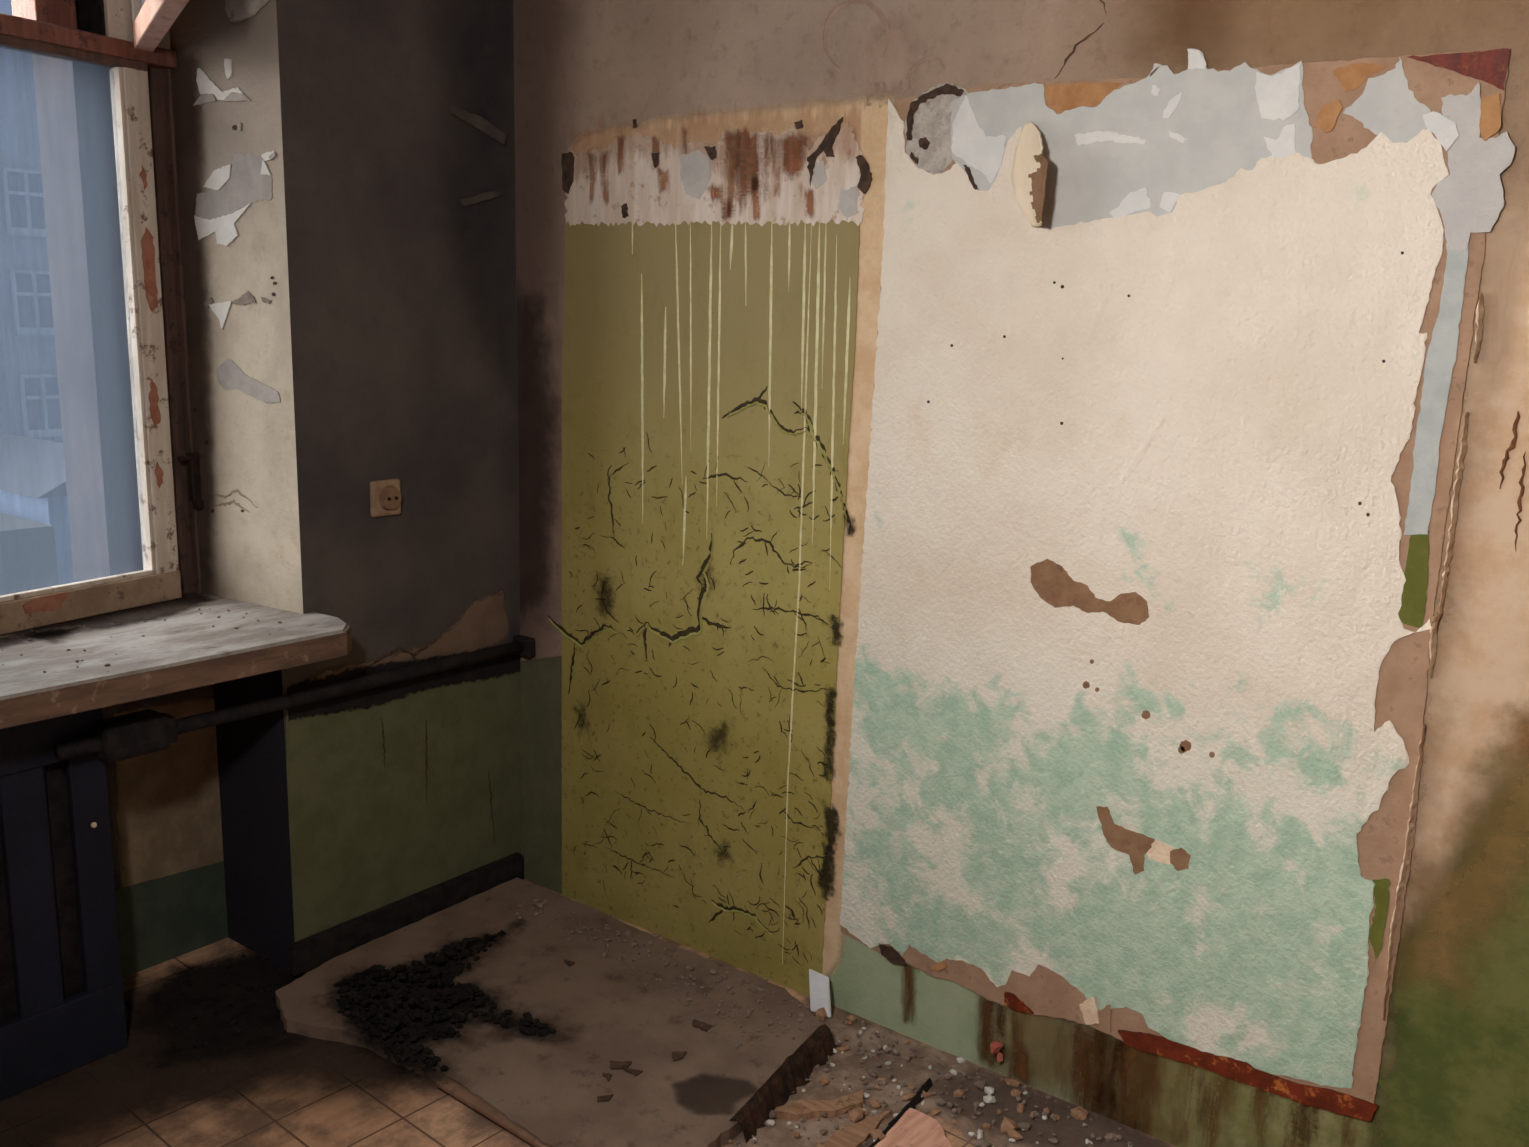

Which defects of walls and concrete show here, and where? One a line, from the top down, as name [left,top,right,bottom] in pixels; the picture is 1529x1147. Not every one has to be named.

crack [1056,0,1106,77]
peeling [194,151,277,246]
water stain [663,219,747,565]
peeling [561,48,1515,977]
crack [1499,411,1526,550]
water stain [597,580,613,614]
water stain [768,218,855,964]
crack [548,386,851,964]
corrosion [903,964,914,1022]
peeling [879,943,1111,1032]
corrosion [980,998,1030,1085]
corrosion [1069,1021,1157,1135]